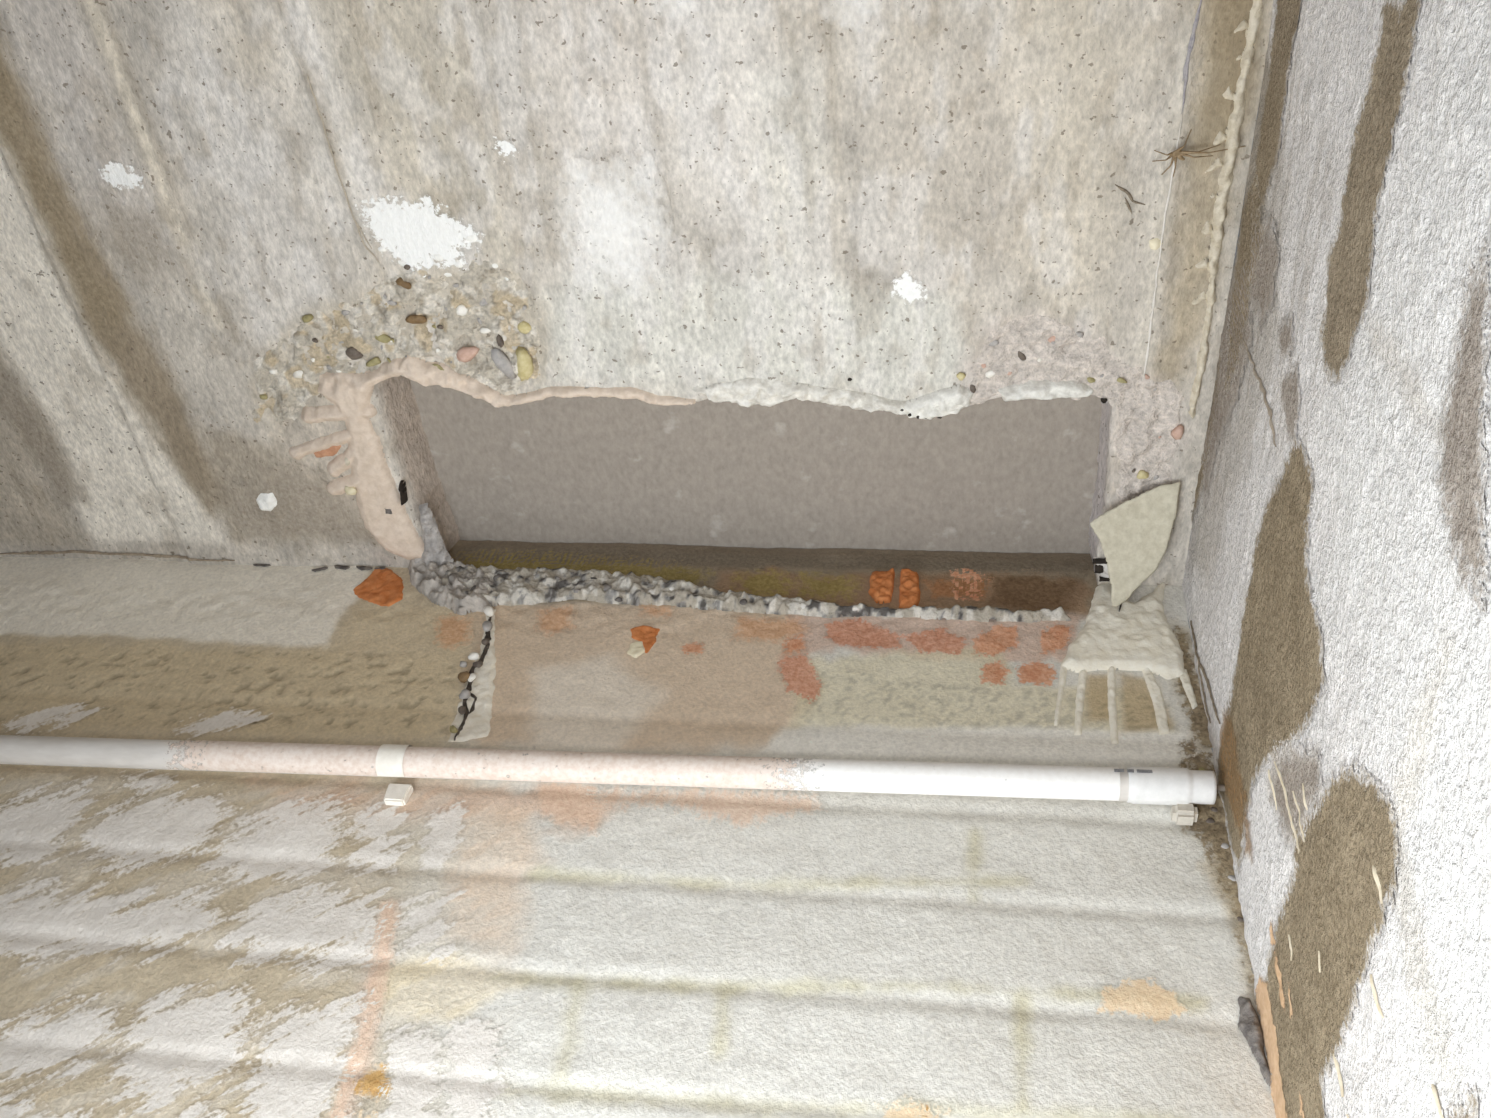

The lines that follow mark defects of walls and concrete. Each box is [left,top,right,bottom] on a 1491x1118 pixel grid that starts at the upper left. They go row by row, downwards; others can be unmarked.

damp [1318,0,1421,387]
spalling [252,253,545,424]
flaking render [314,445,341,458]
spalling [692,314,1184,609]
damp [1431,234,1491,621]
flaking render [353,568,404,607]
crack [448,606,496,742]
rust [920,568,1085,614]
damp [1185,0,1401,1118]